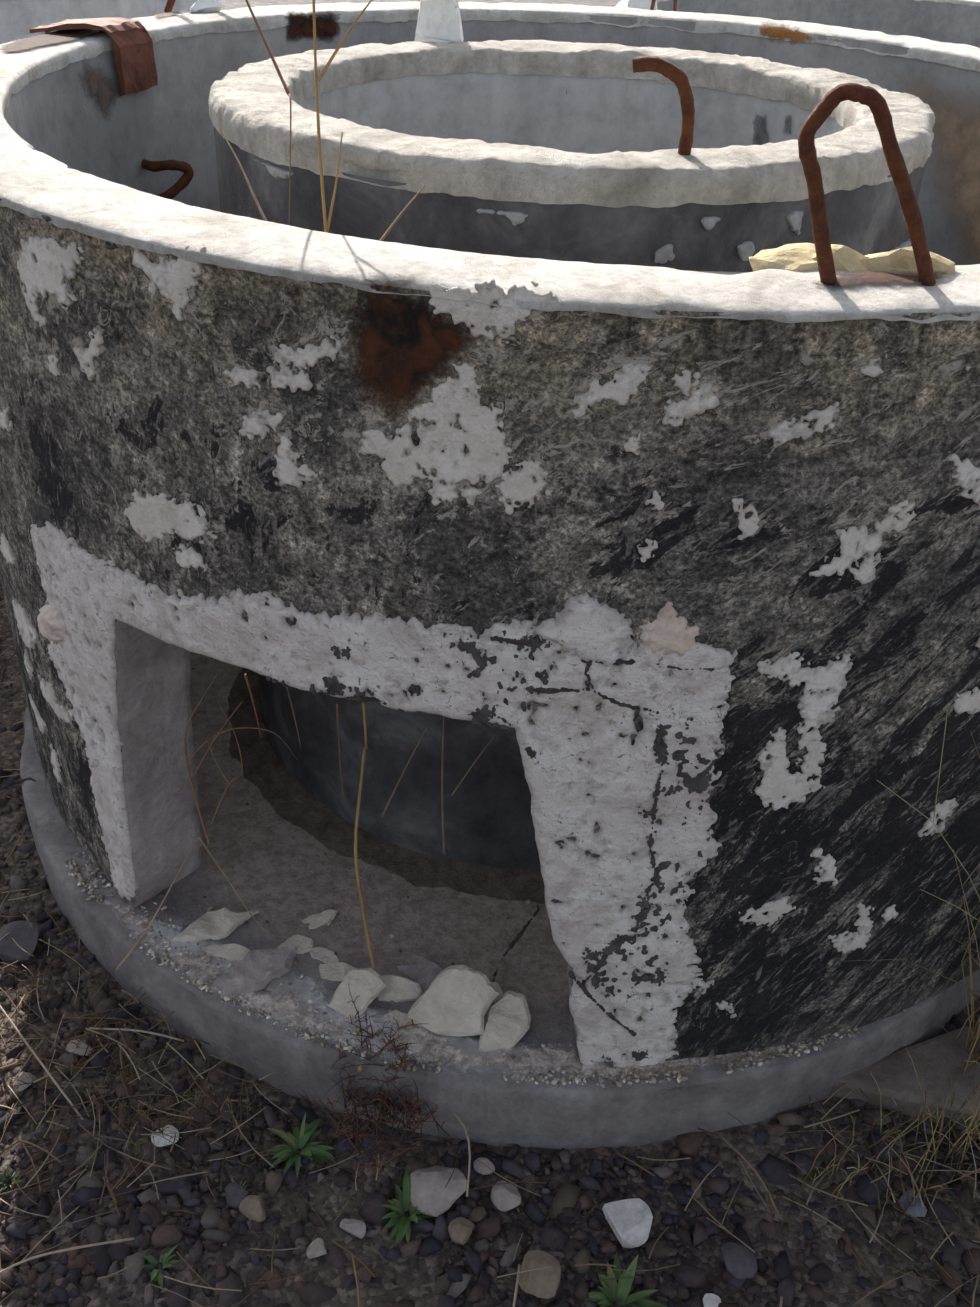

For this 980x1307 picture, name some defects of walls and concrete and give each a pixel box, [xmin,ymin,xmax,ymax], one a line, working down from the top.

corrosion [287,12,340,40]
corrosion [761,24,809,43]
corrosion [814,271,945,287]
corrosion [353,281,472,416]
peeling [358,361,553,515]
peeling [123,488,218,572]
crack [490,636,552,646]
crack [322,676,404,712]
peeling [751,652,853,811]
spalling [12,521,800,1077]
crack [533,659,715,932]
crack [568,971,637,1036]